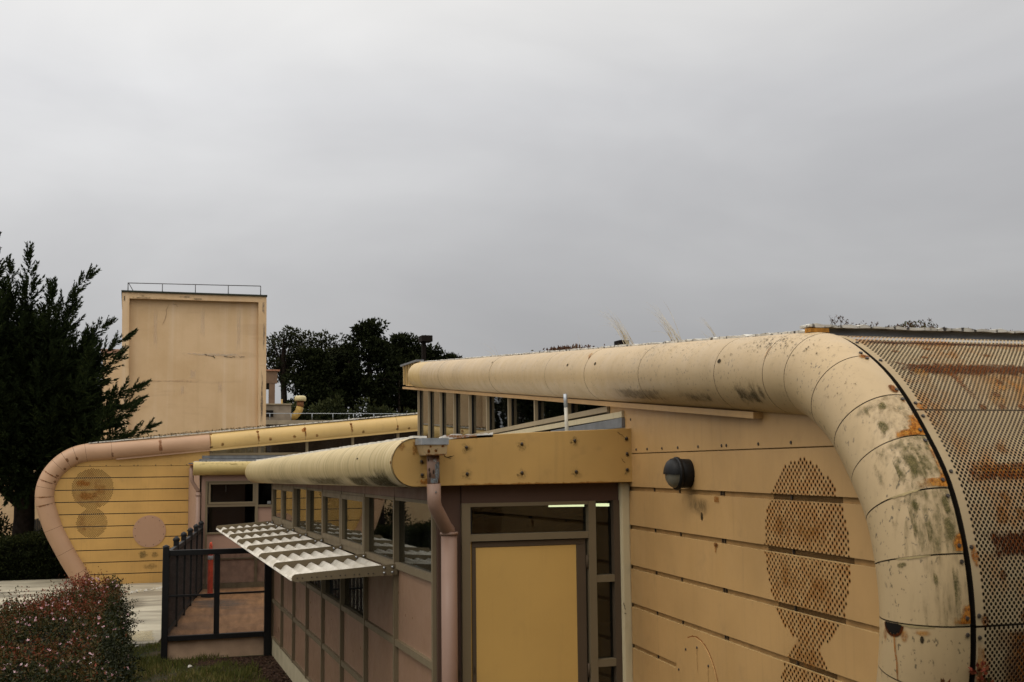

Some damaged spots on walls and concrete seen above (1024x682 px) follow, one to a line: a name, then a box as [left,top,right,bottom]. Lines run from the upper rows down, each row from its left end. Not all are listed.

corrosion [861,341,1024,410]
corrosion [896,403,948,486]
water stain [893,436,957,550]
corrosion [969,444,1024,580]
corrosion [884,622,906,680]